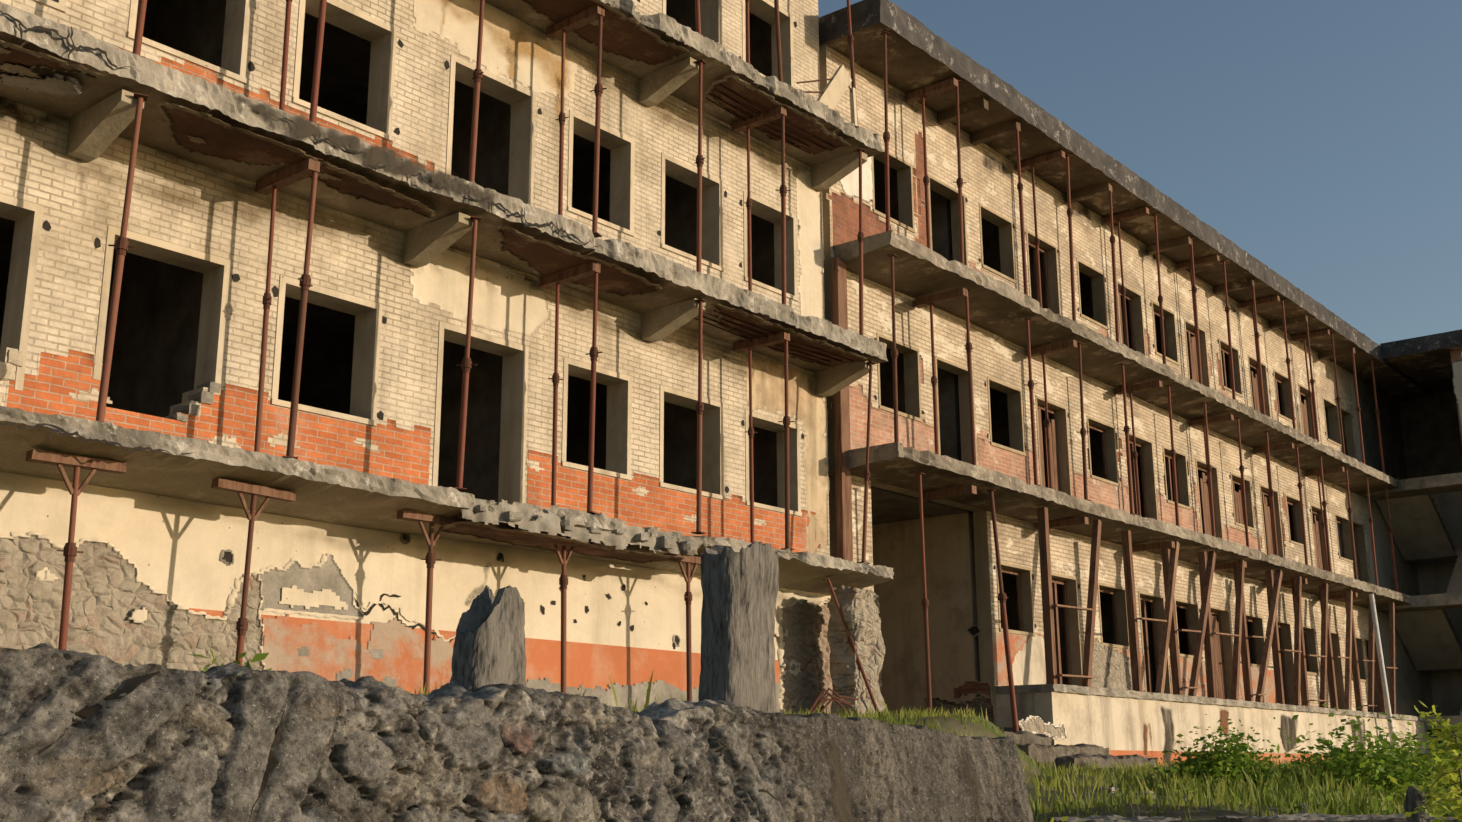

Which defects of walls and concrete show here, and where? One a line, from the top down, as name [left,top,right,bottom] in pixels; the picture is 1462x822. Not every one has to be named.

flaking render [0,348,432,485]
flaking render [437,449,821,564]
peeling [0,531,453,692]
crack [354,592,456,643]
peeling [526,677,699,712]
peeling [774,598,833,715]